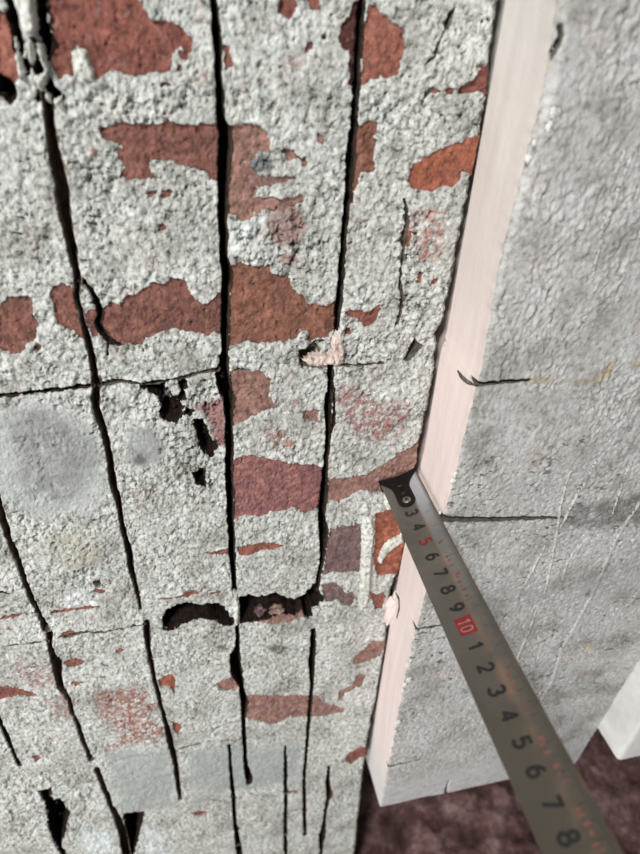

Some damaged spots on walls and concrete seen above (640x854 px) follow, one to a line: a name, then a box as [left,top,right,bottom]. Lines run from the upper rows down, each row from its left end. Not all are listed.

spalling [0,0,193,105]
spalling [100,121,218,181]
crack [78,277,122,356]
spalling [50,262,351,369]
crack [0,366,221,398]
hole [138,378,217,458]
crack [340,360,384,368]
crack [457,370,531,387]
spalling [233,440,419,520]
crack [439,512,574,523]
spalling [160,522,362,631]
crack [8,622,168,646]